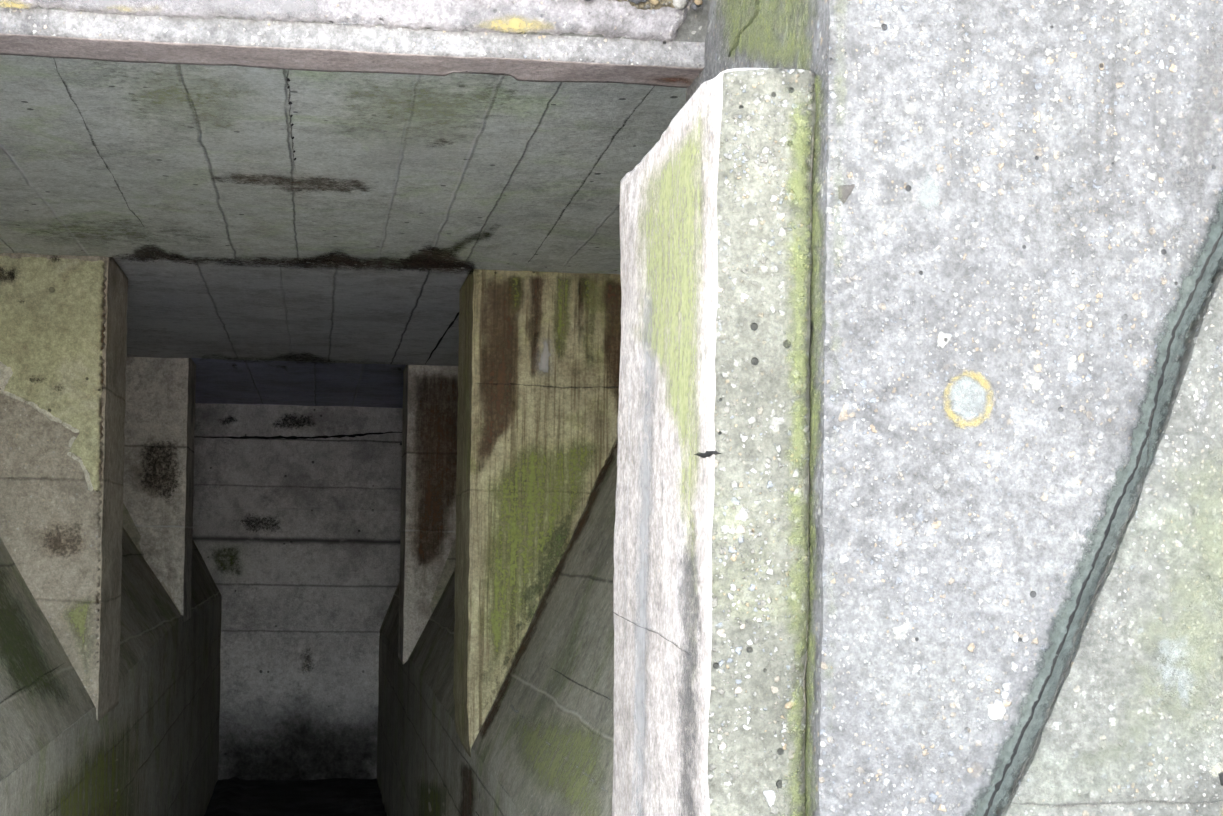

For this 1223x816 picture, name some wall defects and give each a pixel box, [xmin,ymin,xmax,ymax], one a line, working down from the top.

crack [728,0,760,57]
crack [53,58,140,221]
damp [213,174,369,192]
crack [287,71,296,161]
crack [532,86,655,258]
damp [0,267,17,282]
peeling [0,255,105,492]
damp [97,245,475,522]
damp [478,278,621,471]
damp [44,524,81,556]
damp [414,375,458,566]
crack [983,223,1223,816]